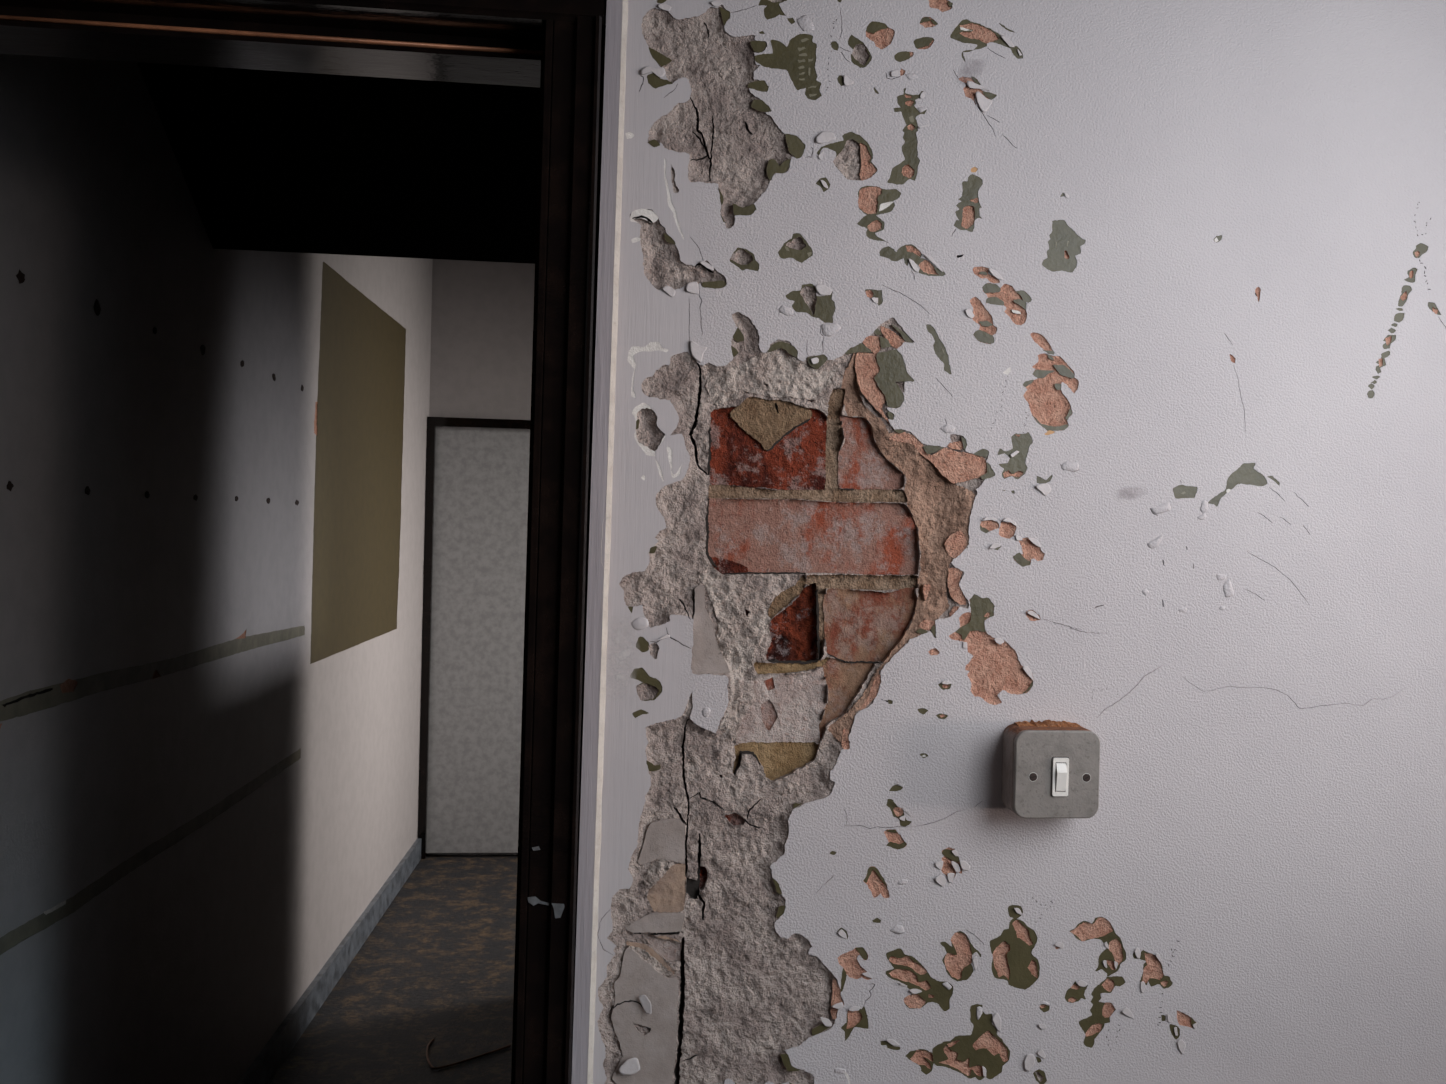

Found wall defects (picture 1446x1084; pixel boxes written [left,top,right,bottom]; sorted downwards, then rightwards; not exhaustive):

spalling [625,0,1023,279]
spalling [630,208,759,297]
peeling [1042,220,1085,273]
peeling [1367,243,1428,398]
peeling [1173,463,1280,507]
spalling [597,254,1079,1084]
peeling [1039,917,1173,1048]
peeling [1161,1011,1198,1054]